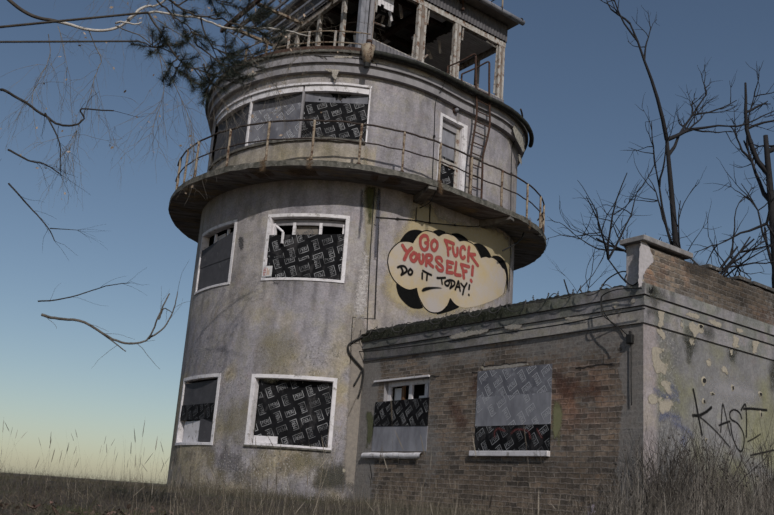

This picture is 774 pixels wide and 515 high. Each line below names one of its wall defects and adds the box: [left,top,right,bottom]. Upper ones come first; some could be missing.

damp [359,187,380,263]
peeling [638,241,655,287]
peeling [648,310,673,414]
peeling [680,312,722,345]